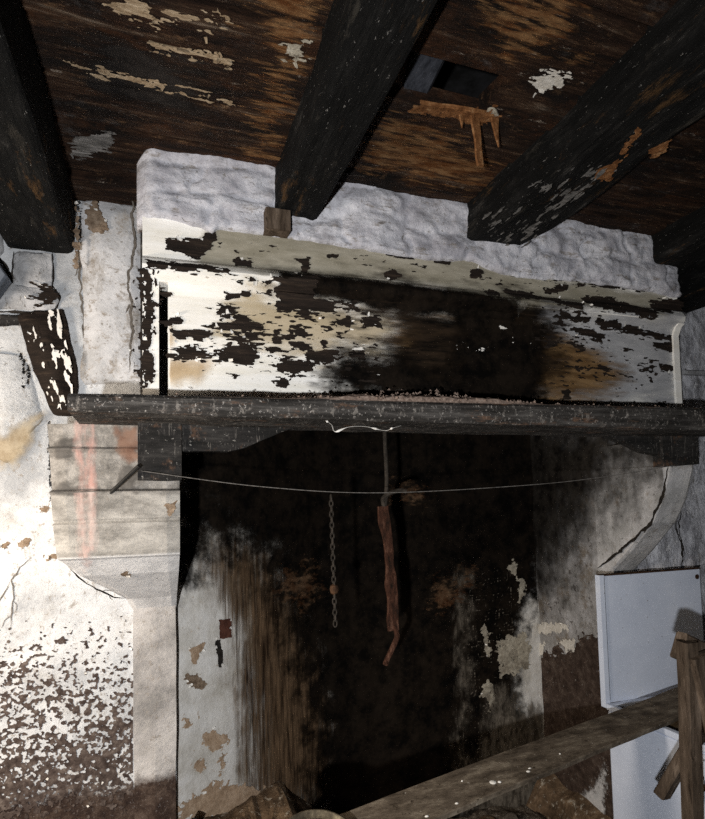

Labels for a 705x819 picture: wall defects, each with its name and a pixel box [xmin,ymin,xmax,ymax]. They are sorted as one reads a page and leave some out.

peeling [102,0,234,70]
peeling [62,60,235,108]
peeling [528,69,573,98]
peeling [464,265,684,402]
leakage [0,415,50,464]
leakage [48,439,74,458]
crack [598,468,668,568]
crack [675,512,685,565]
peeling [479,622,609,737]
peeling [0,613,133,819]
spalling [176,727,266,819]
peeling [554,749,614,819]